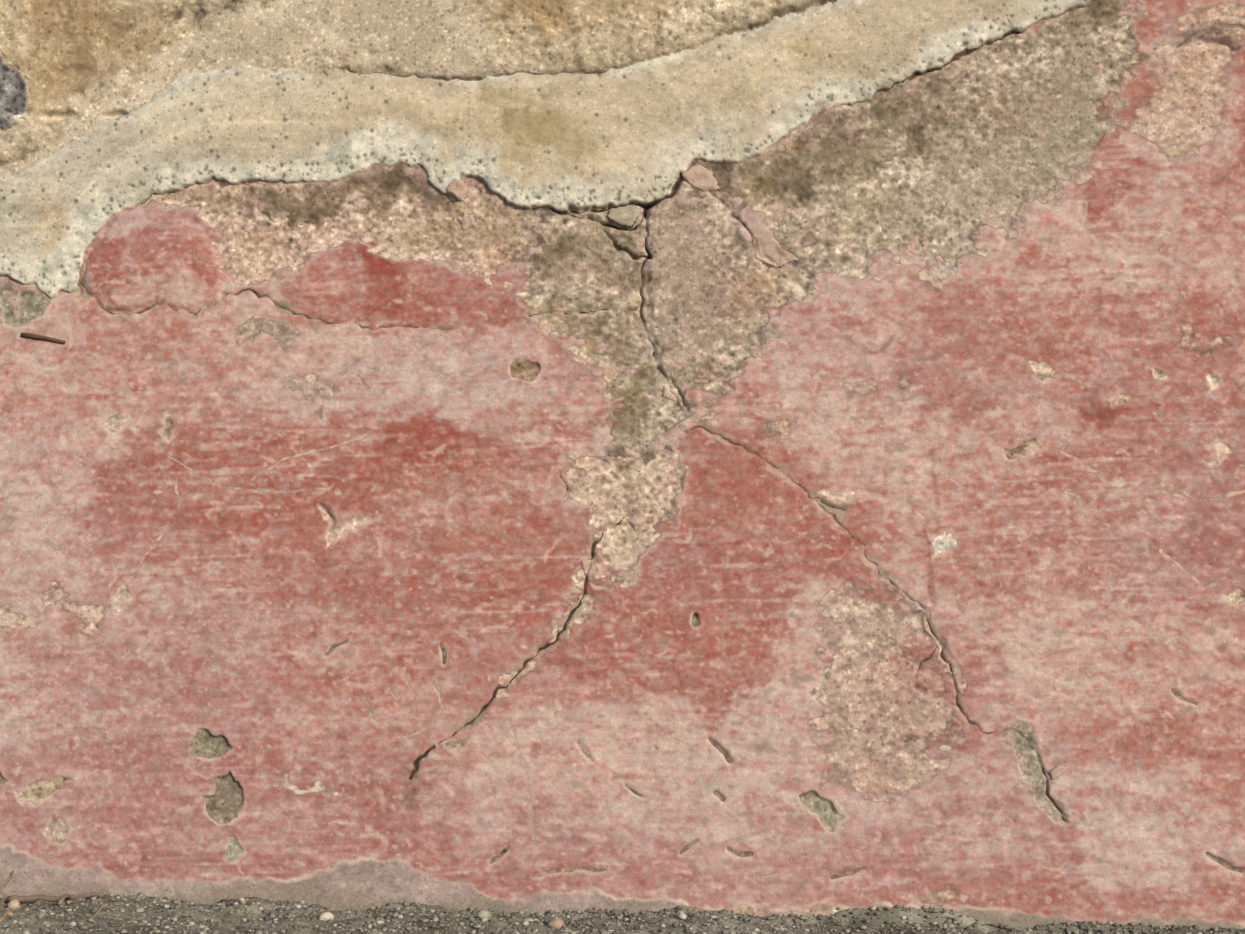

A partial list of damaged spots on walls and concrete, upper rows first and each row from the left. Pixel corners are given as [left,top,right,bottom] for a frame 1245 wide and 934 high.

crack [329,66,621,81]
crack [873,30,1020,97]
crack [528,172,682,357]
spalling [135,0,1245,699]
crack [672,381,1001,735]
crack [408,513,631,780]
peeling [190,729,232,758]
peeling [202,771,244,861]
spalling [799,572,968,832]
spalling [1001,720,1069,823]
crack [1042,767,1066,822]
spalling [1205,852,1244,873]